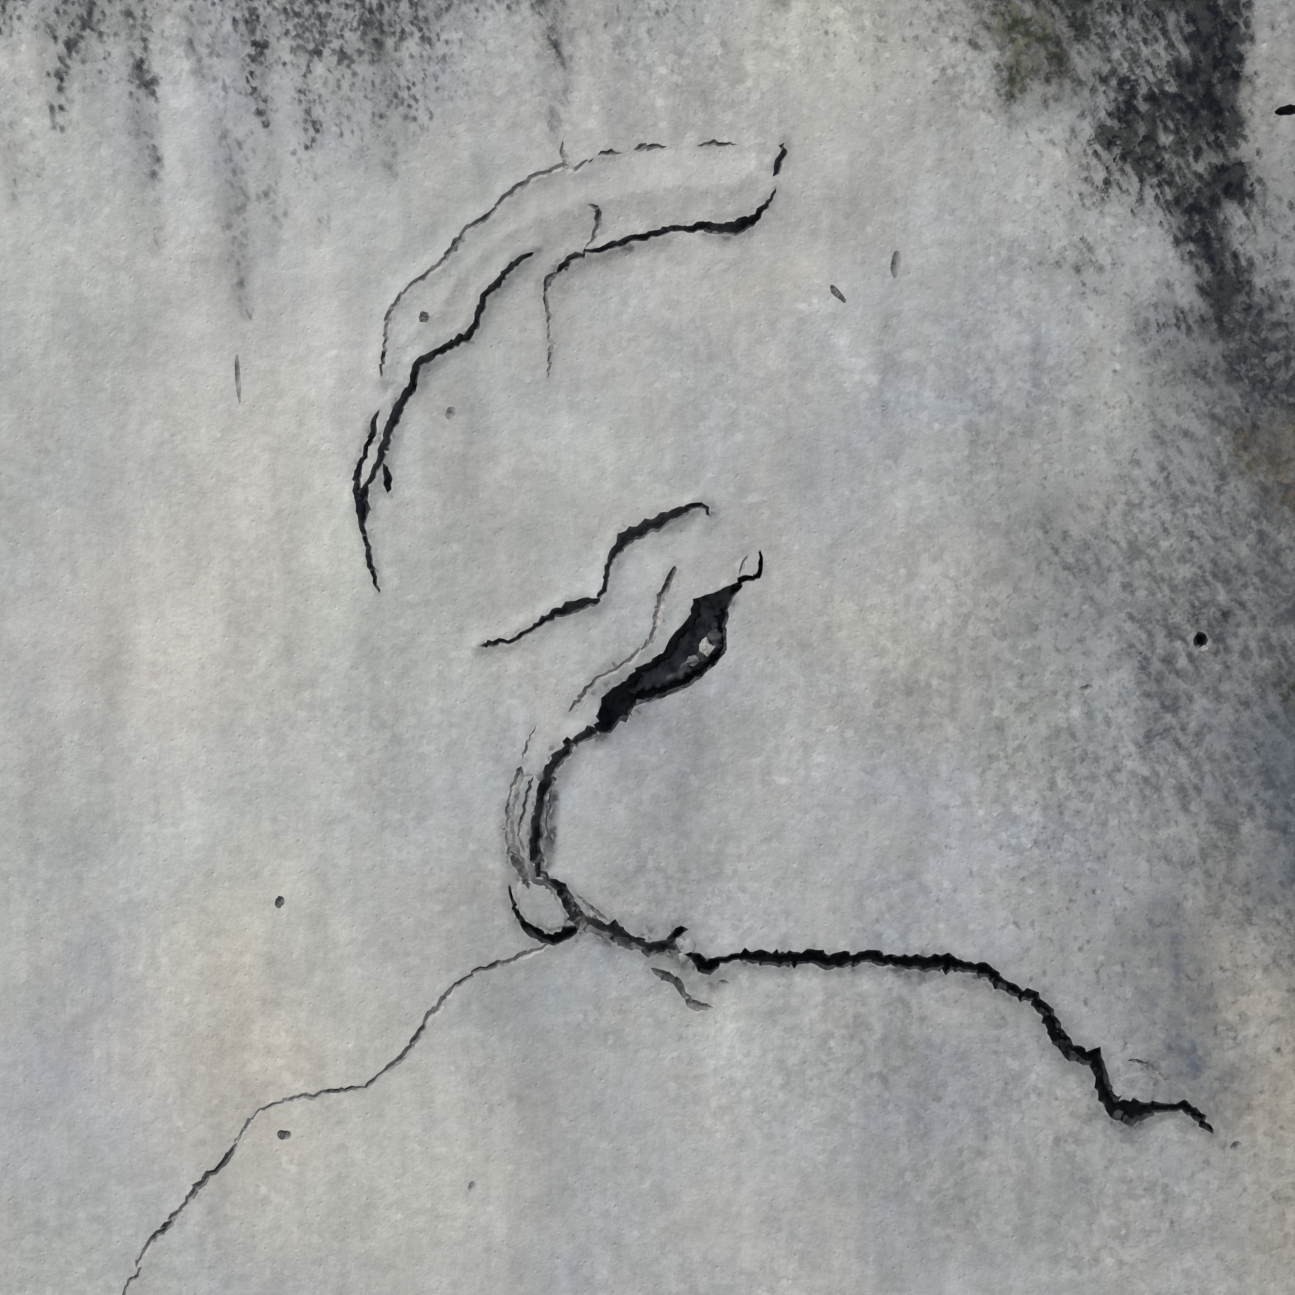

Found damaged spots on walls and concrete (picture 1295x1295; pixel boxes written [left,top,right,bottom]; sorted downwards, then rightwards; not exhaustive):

leakage [0,0,159,131]
leakage [185,0,462,150]
leakage [531,0,564,67]
crack [352,139,787,592]
leakage [1021,0,1295,925]
crack [480,502,712,648]
crack [122,566,1214,1295]